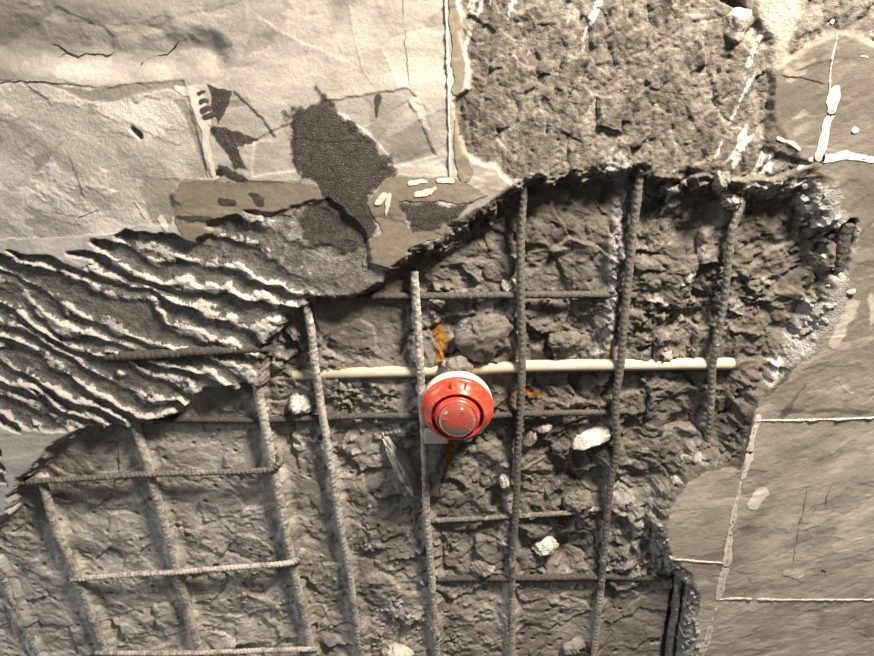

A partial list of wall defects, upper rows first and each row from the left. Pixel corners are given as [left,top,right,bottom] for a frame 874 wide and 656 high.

spalling [723,7,752,44]
crack [52,43,114,58]
corrosion [433,321,450,365]
spalling [0,159,858,656]
corrosion [443,439,457,478]
crack [793,482,833,563]